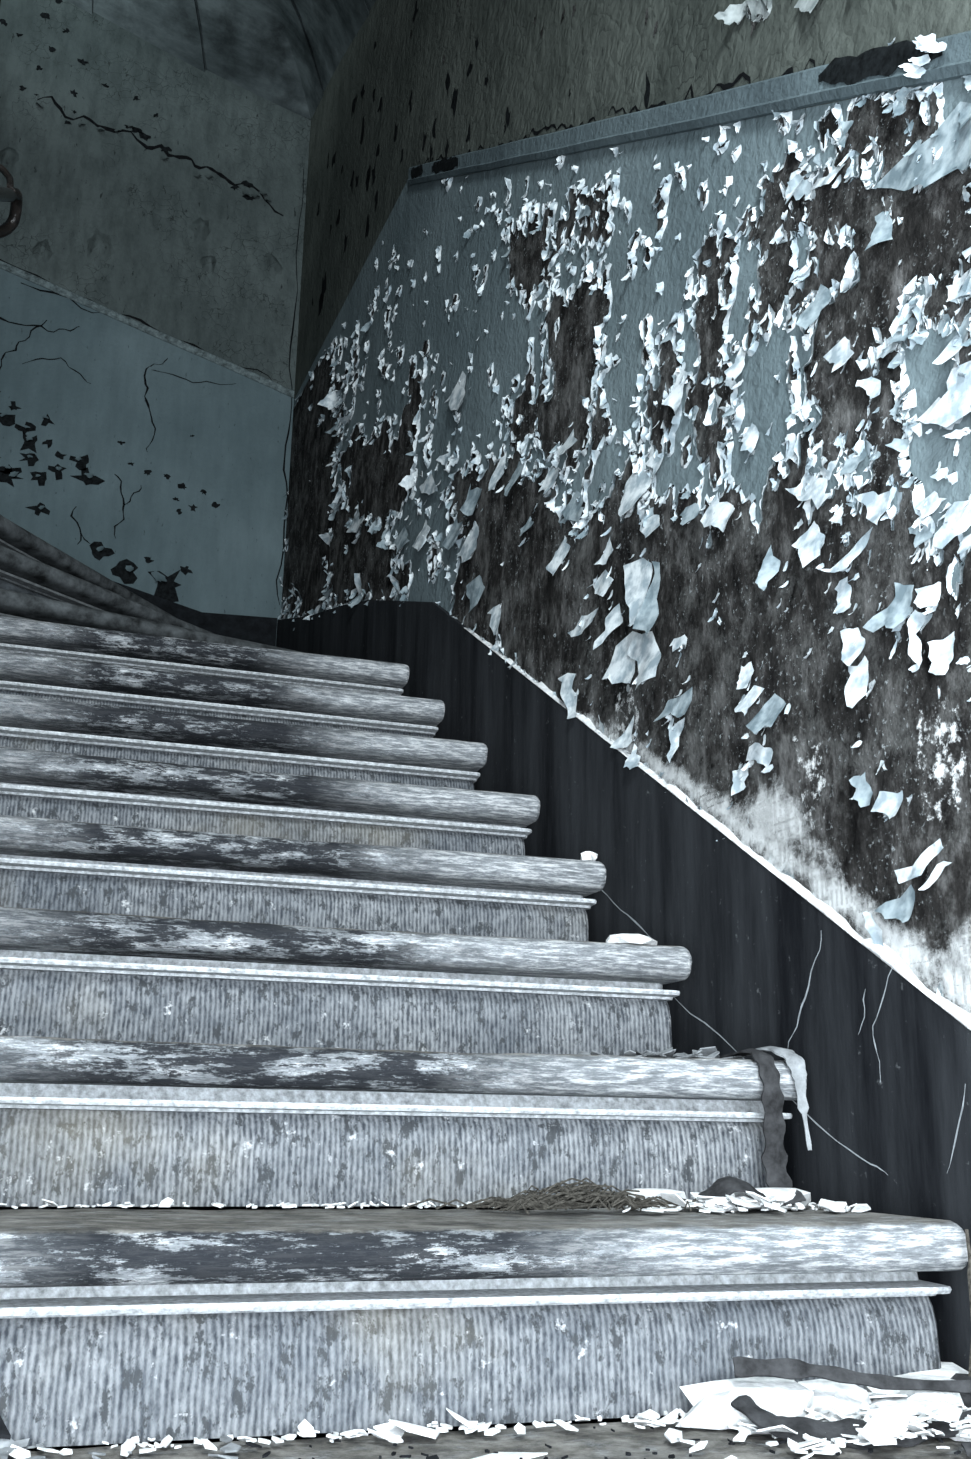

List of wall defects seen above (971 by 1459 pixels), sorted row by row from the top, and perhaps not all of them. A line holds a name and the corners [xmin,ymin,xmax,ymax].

spalling [36,0,70,70]
peeling [714,0,772,37]
peeling [794,0,819,13]
crack [0,94,304,605]
spalling [0,391,105,516]
peeling [277,33,971,1011]
leakage [586,688,971,1015]